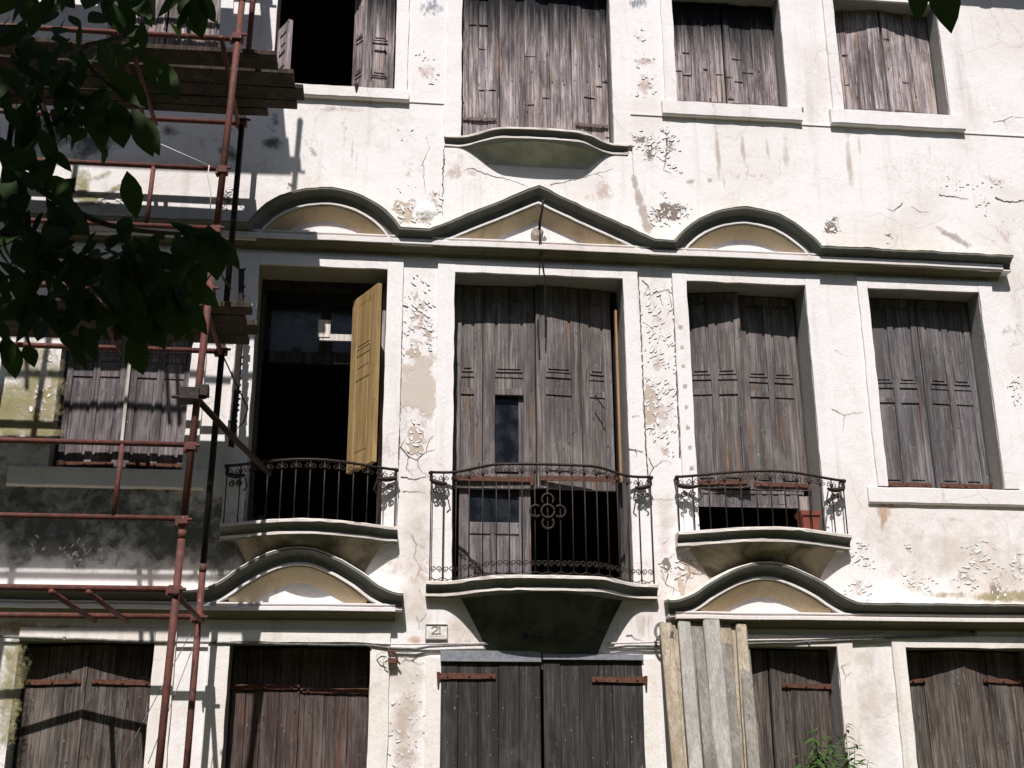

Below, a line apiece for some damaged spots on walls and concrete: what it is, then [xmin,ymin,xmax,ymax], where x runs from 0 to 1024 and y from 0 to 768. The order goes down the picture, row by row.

peeling [632,126,683,173]
spalling [392,185,444,226]
damp [68,185,1014,281]
crack [422,128,675,232]
spalling [648,191,692,226]
spalling [824,217,840,233]
peeling [400,273,437,454]
peeling [640,288,677,457]
peeling [953,540,1024,598]